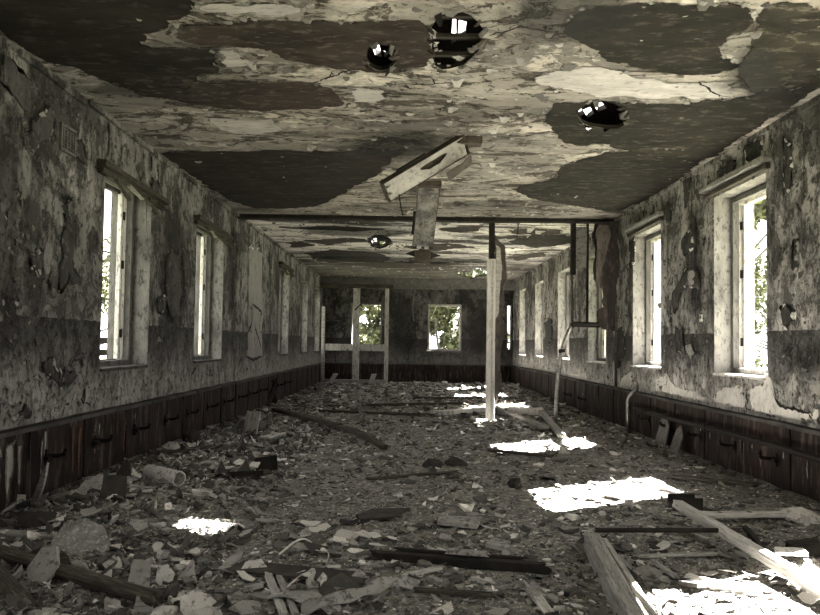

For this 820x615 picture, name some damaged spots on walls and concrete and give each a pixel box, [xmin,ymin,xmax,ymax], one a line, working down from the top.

peeling [0,0,438,143]
peeling [514,1,820,213]
peeling [161,149,398,209]
peeling [680,226,694,256]
peeling [156,248,182,321]
peeling [671,265,701,316]
peeling [778,303,797,331]
flaking render [619,372,632,388]